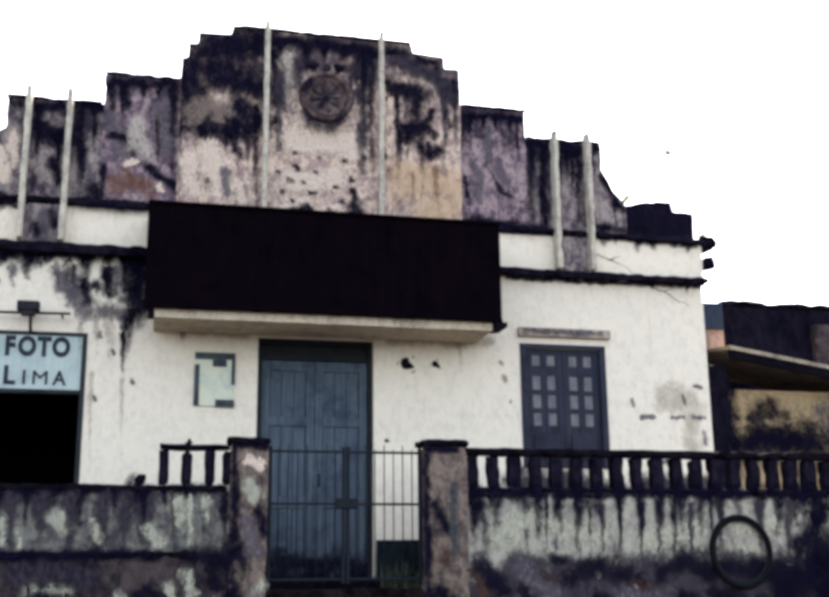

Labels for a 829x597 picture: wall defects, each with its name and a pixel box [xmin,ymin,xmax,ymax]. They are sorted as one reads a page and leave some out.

leakage [8,26,698,251]
leakage [728,388,829,461]
leakage [0,442,367,597]
leakage [422,445,459,597]
leakage [468,467,829,597]